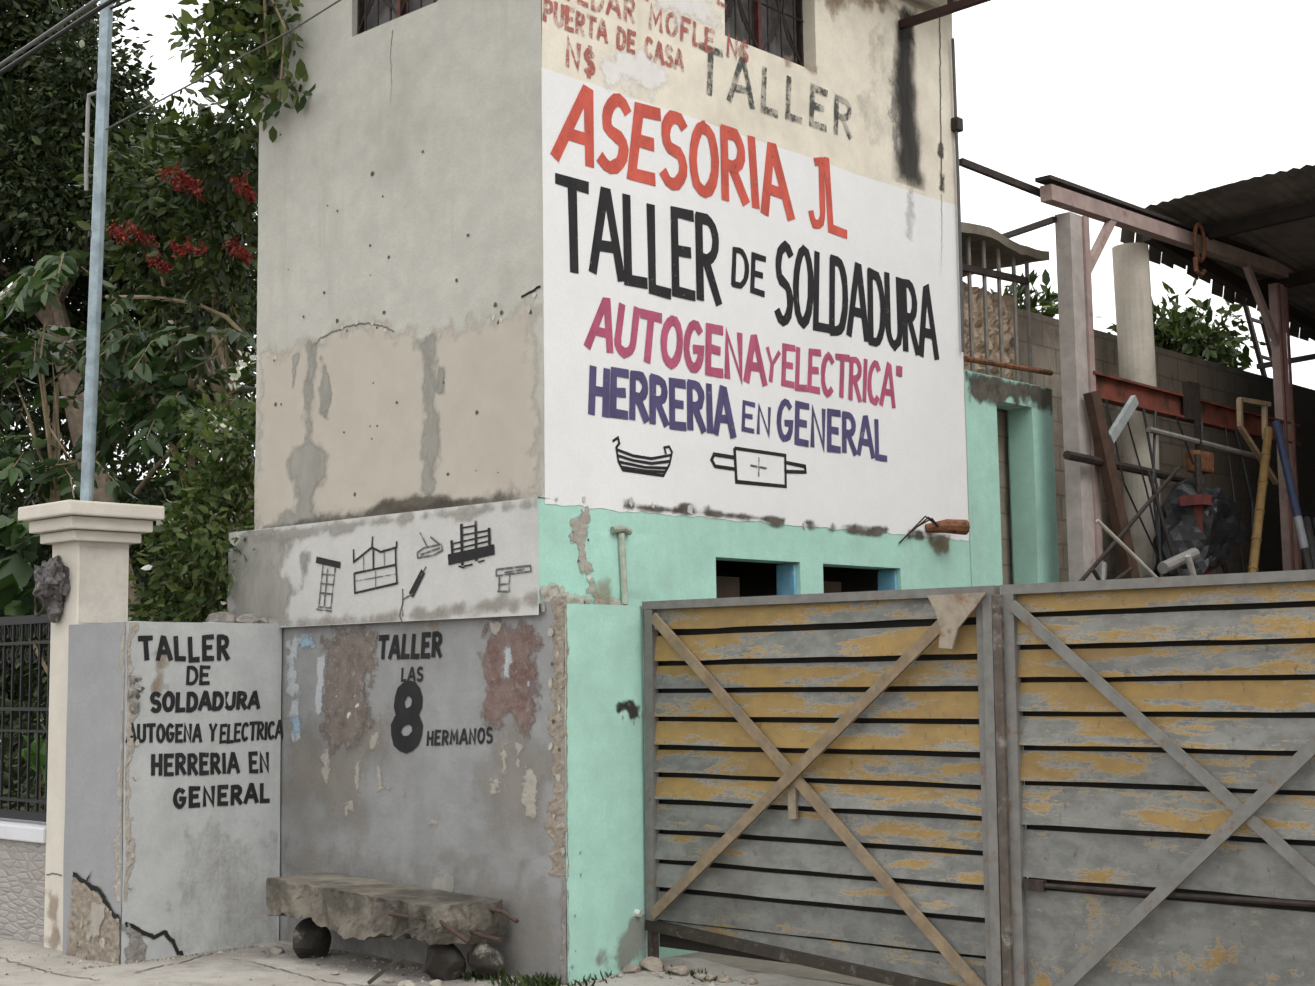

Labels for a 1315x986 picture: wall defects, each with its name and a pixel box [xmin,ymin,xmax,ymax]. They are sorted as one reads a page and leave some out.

damp [891,7,922,186]
peeling [311,320,394,349]
peeling [569,497,622,605]
peeling [624,497,785,527]
peeling [831,524,888,536]
peeling [285,625,379,755]
spalling [617,700,643,724]
spalling [113,622,145,902]
peeling [478,586,582,985]
crack [46,872,184,956]
peeling [618,914,646,970]